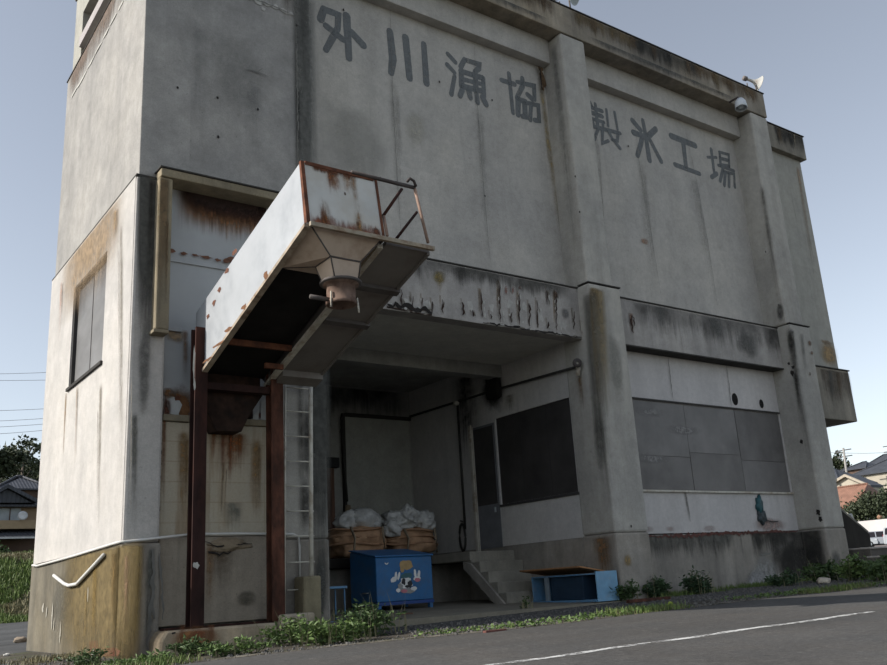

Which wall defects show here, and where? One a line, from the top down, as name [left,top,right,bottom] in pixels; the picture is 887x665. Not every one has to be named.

corrosion [313,166,355,195]
damp [138,176,157,317]
corrosion [157,179,237,277]
corrosion [186,192,266,232]
corrosion [313,211,380,235]
damp [131,341,149,399]
damp [585,294,621,425]
corrosion [162,389,190,460]
damp [650,534,741,551]
damp [753,531,841,579]